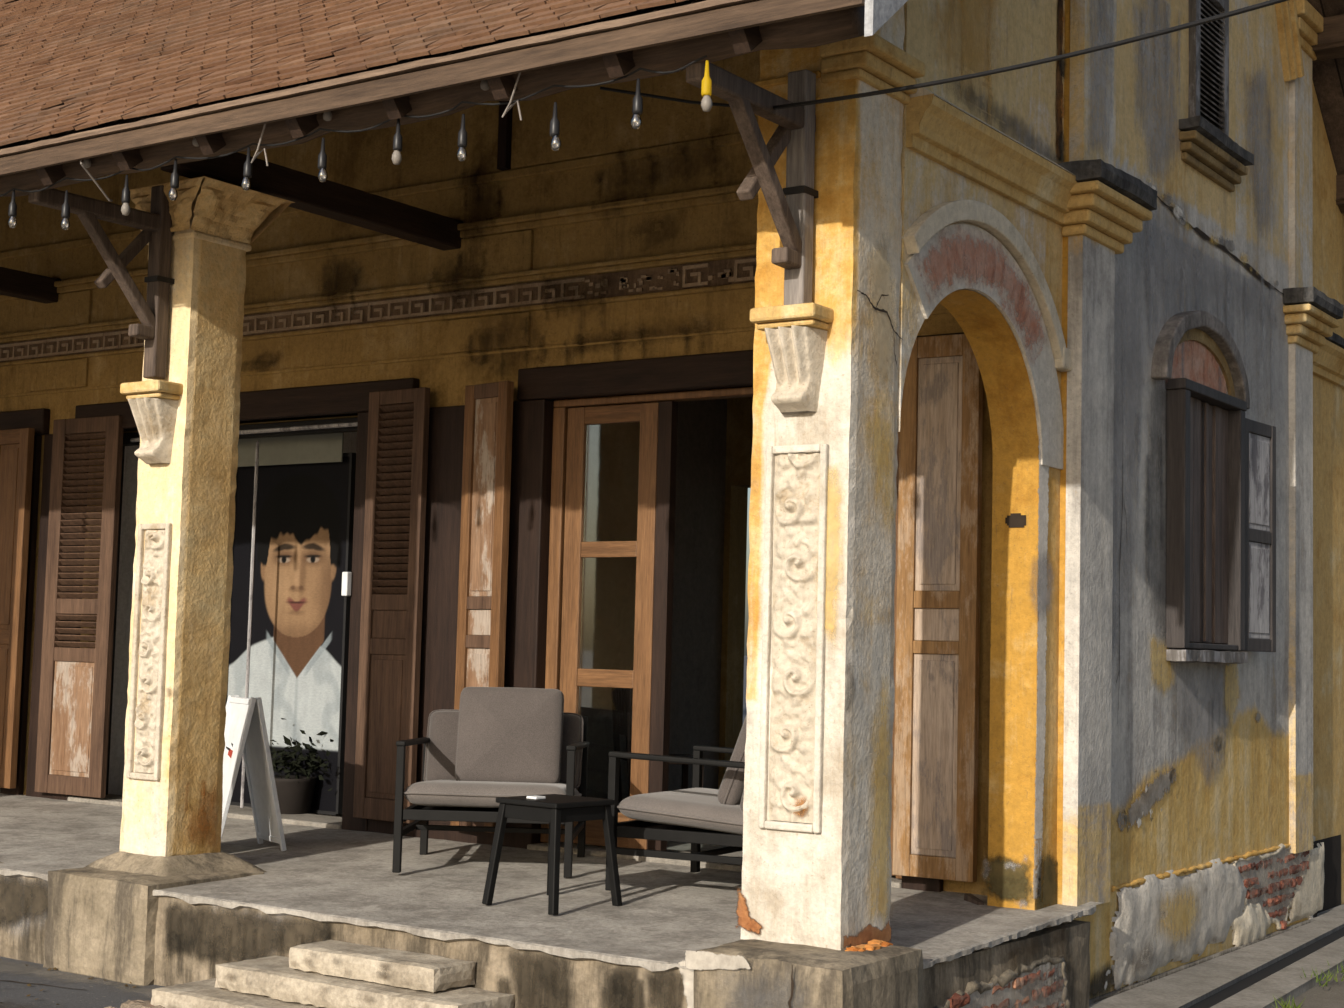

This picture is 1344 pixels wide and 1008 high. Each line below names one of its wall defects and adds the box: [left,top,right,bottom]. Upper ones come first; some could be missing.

crack [857,290,903,369]
peeling [1117,768,1176,832]
flaking render [1112,836,1316,930]
flaking render [933,955,1071,1008]